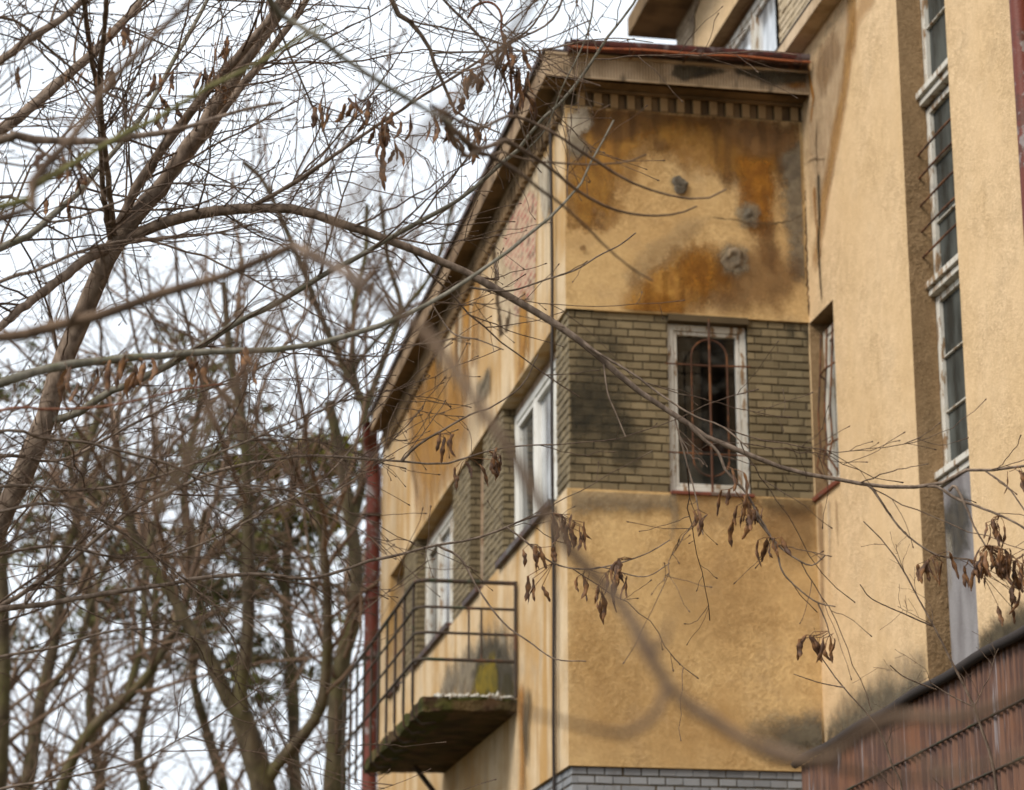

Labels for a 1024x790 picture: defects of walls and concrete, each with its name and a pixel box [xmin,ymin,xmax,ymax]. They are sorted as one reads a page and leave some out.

spalling [672,175,689,194]
damp [566,0,852,312]
corrosion [738,158,776,260]
crack [713,121,824,314]
damp [440,625,514,697]